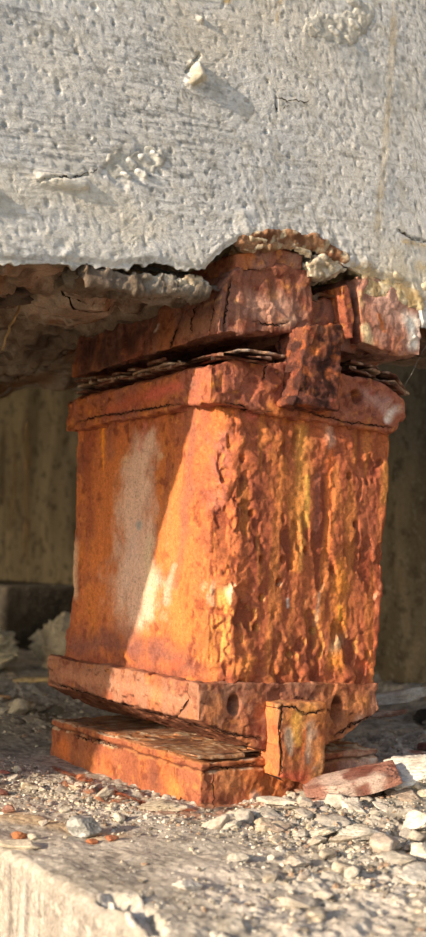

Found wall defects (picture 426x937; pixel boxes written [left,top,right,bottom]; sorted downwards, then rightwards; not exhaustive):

spalling [53,263,214,306]
corrosion [75,349,286,396]
corrosion [340,359,409,397]
corrosion [60,717,261,760]
corrosion [51,766,145,804]